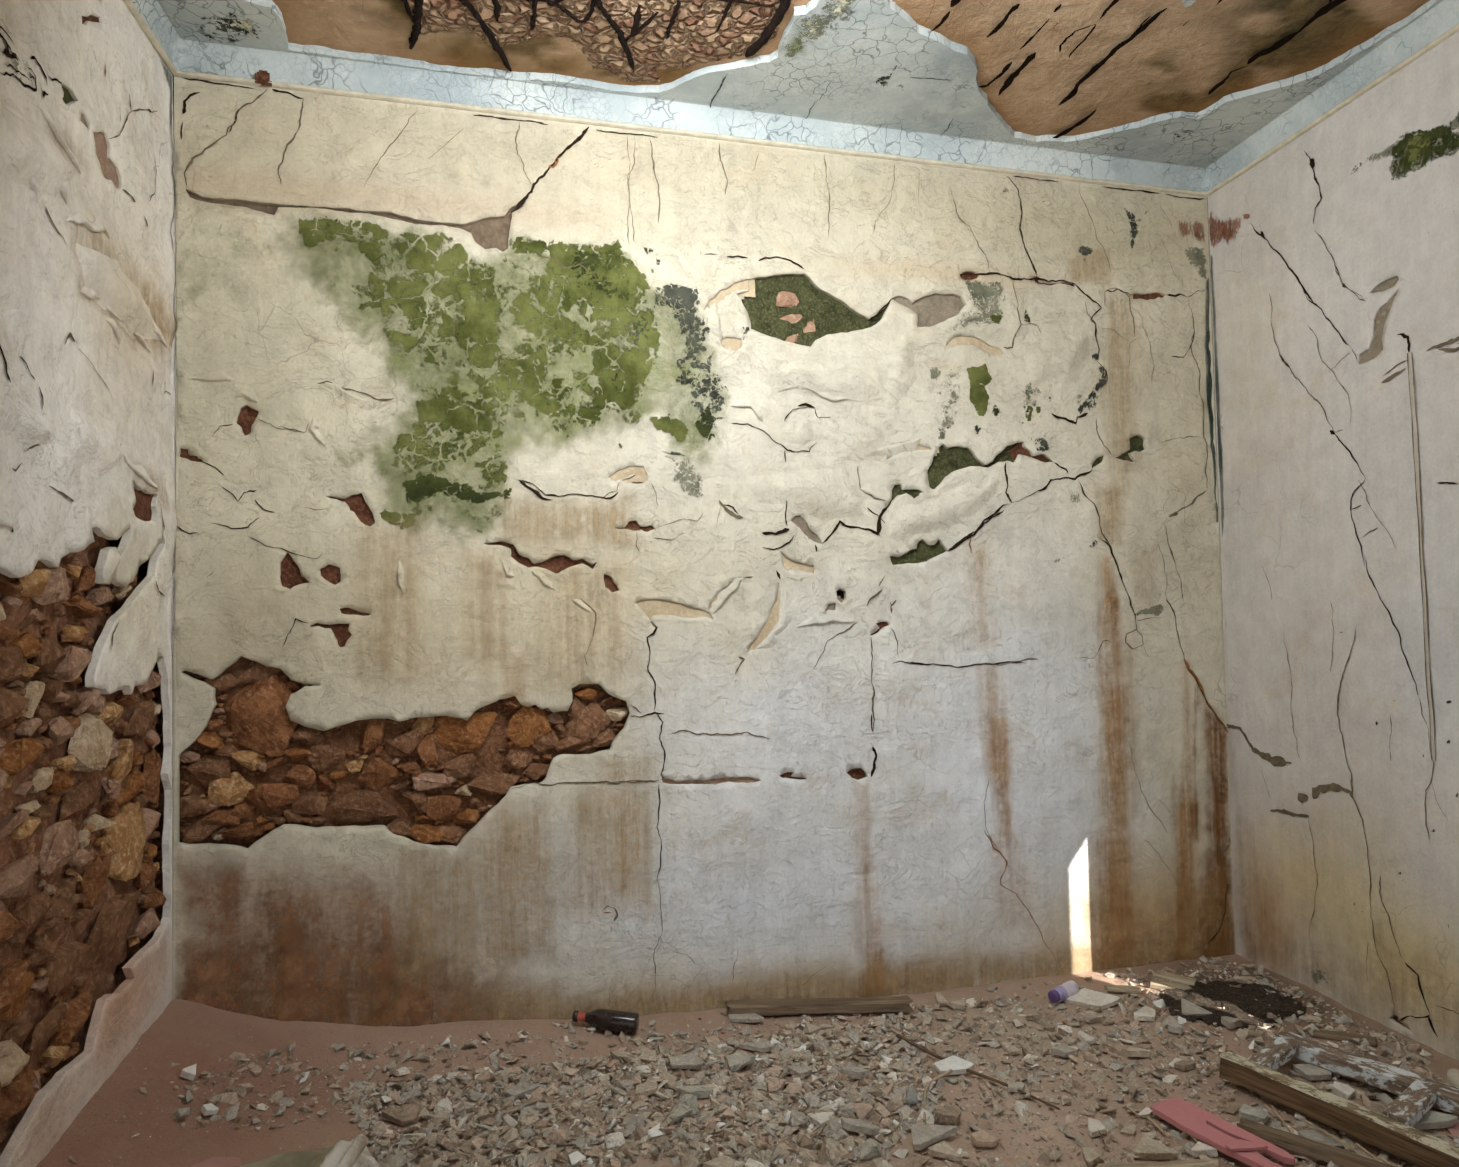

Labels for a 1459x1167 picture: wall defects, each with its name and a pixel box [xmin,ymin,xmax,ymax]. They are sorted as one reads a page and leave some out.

spalling [272,0,811,86]
crack [909,0,1222,138]
spalling [892,0,1430,136]
crack [431,114,660,244]
mould [629,248,727,429]
flaking render [704,275,965,351]
flaking render [329,494,375,527]
mould [662,451,703,497]
crack [519,467,886,579]
crack [873,151,1459,1037]
crack [814,576,1038,777]
corrosion [1180,715,1229,958]